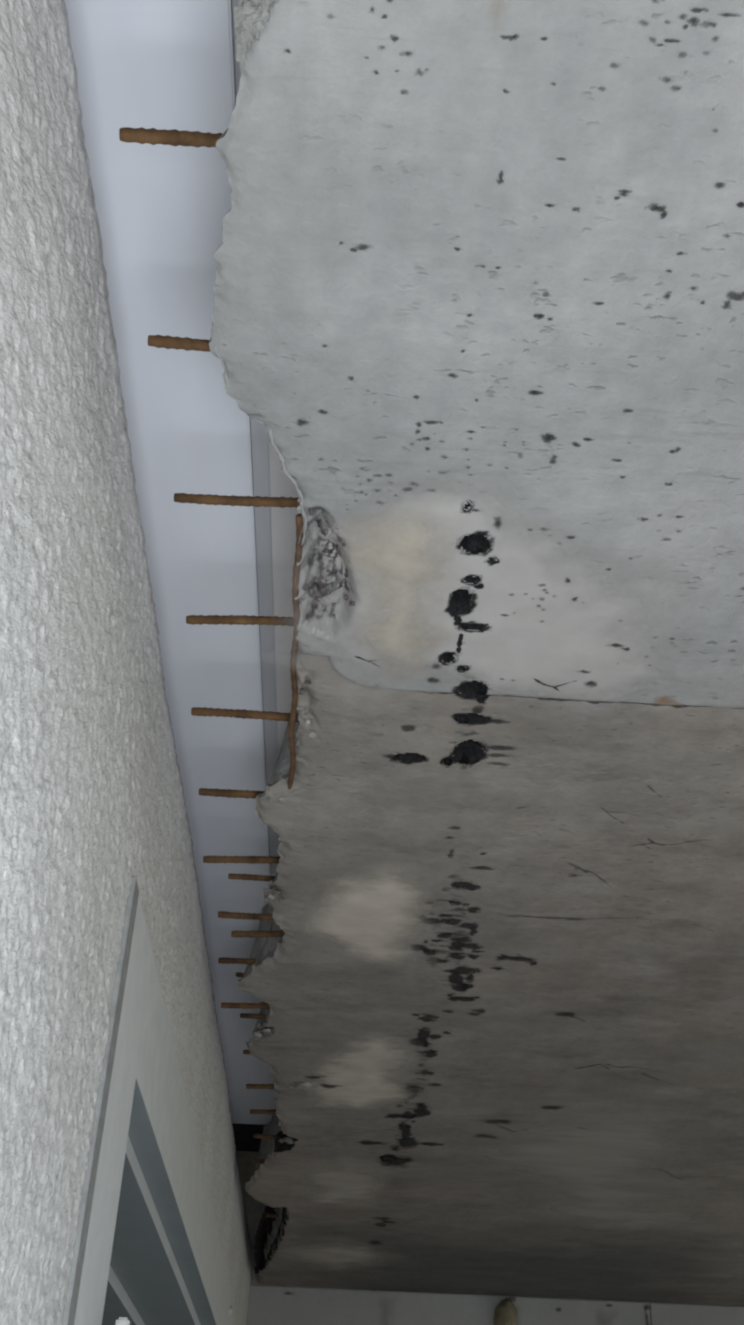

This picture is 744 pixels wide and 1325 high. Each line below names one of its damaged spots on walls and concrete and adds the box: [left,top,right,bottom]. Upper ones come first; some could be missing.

spalling [234,0,278,62]
spalling [174,493,356,824]
spalling [203,843,286,1055]
spalling [245,1065,298,1186]
spalling [253,1205,289,1274]